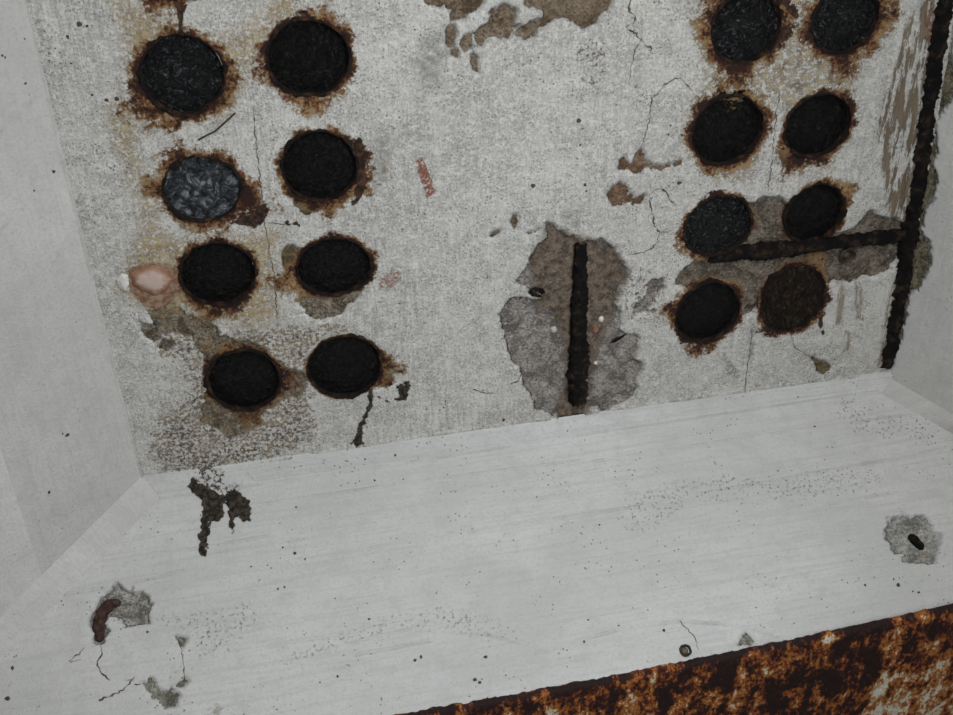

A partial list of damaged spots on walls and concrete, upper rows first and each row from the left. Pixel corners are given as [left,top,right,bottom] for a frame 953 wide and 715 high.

spalling [424,0,612,72]
crack [626,0,652,80]
crack [640,77,692,148]
rust [681,0,911,241]
rust [116,0,400,428]
crack [629,188,676,255]
spalling [498,0,938,417]
rust [528,226,632,417]
rust [358,335,408,396]
leakage [187,465,252,556]
spalling [885,516,940,564]
spalling [89,585,152,644]